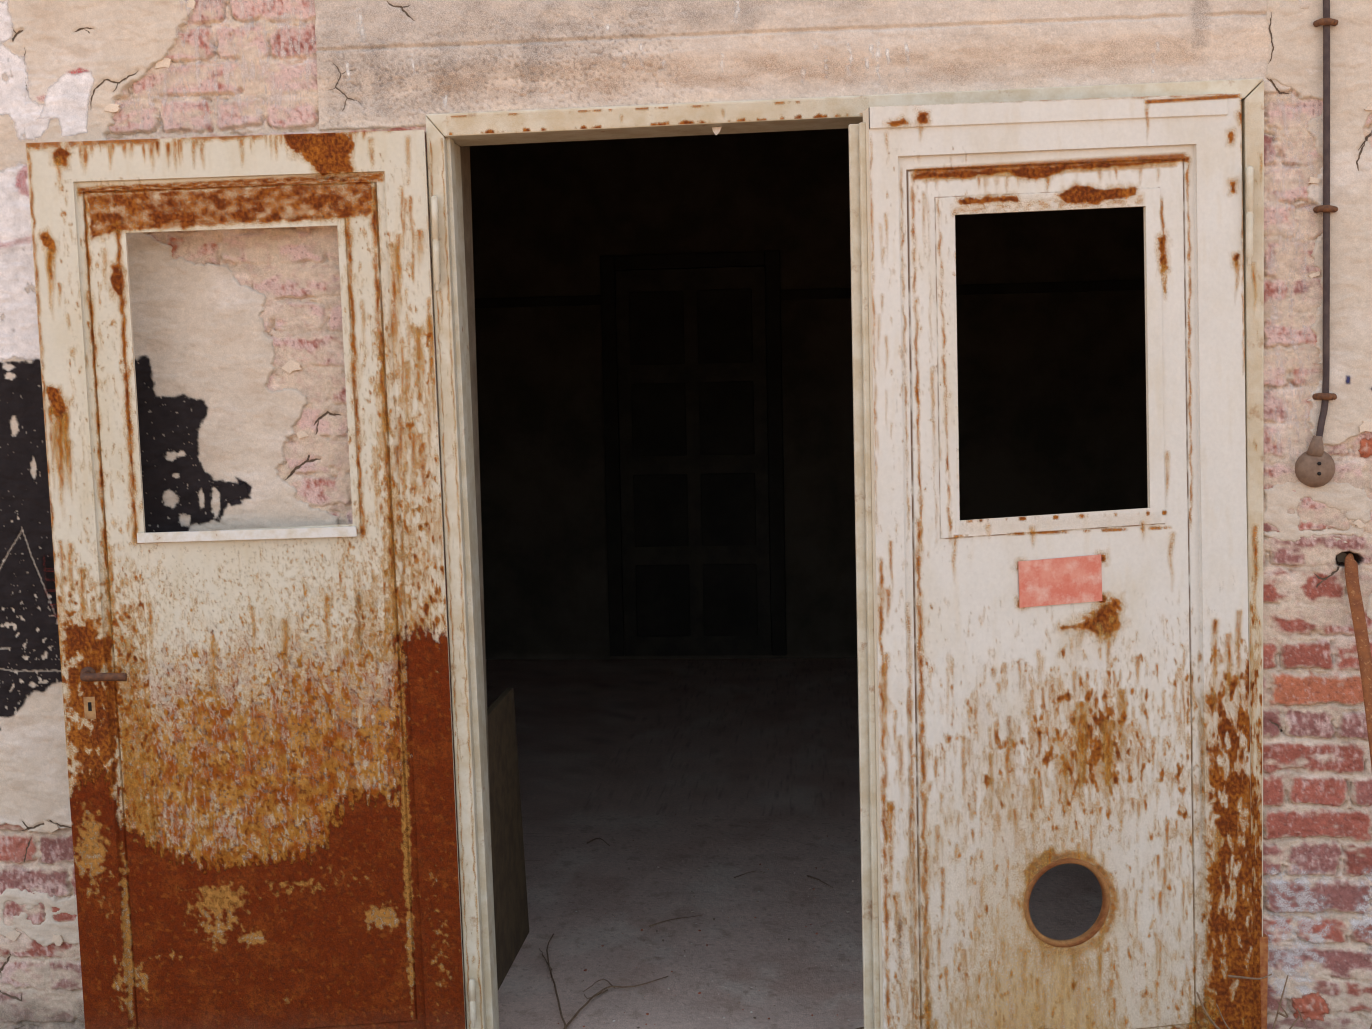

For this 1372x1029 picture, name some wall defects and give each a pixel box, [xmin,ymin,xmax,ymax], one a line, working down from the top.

crack [90,71,138,105]
flaking render [1265,0,1372,458]
flaking render [0,0,196,833]
flaking render [126,232,340,533]
flaking render [1263,482,1372,566]
rust [26,115,483,1029]
flaking render [0,888,79,947]
crack [0,954,23,1029]
spalling [1292,992,1330,1022]